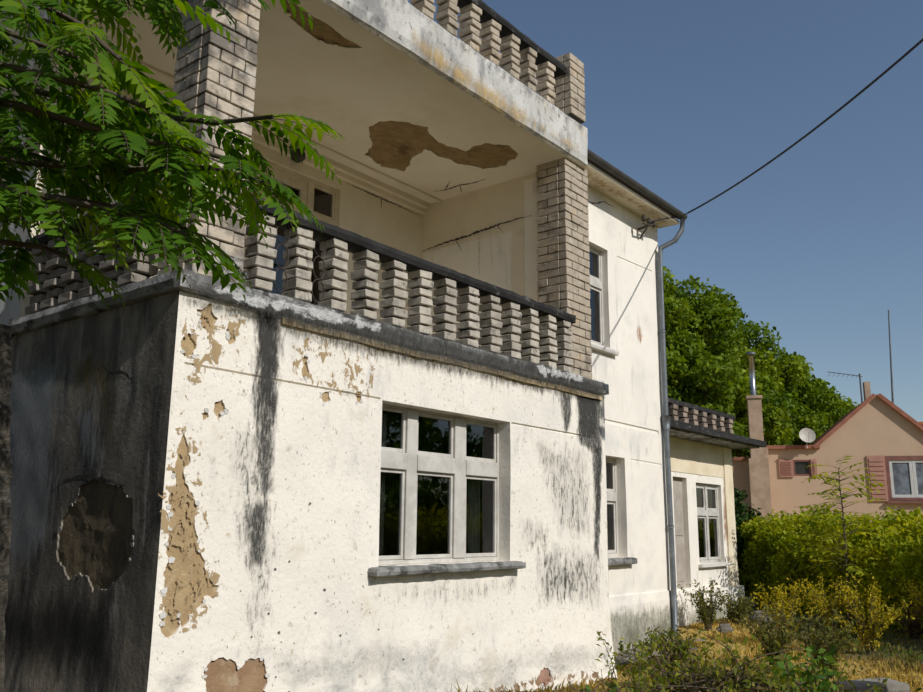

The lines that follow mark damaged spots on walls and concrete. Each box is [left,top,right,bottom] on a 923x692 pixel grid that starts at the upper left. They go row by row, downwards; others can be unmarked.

crack [423,215,532,251]
peeling [180,304,245,397]
peeling [293,333,374,406]
damp [195,282,604,599]
flaking render [158,426,220,637]
damp [4,591,110,676]
flaking render [202,656,277,692]